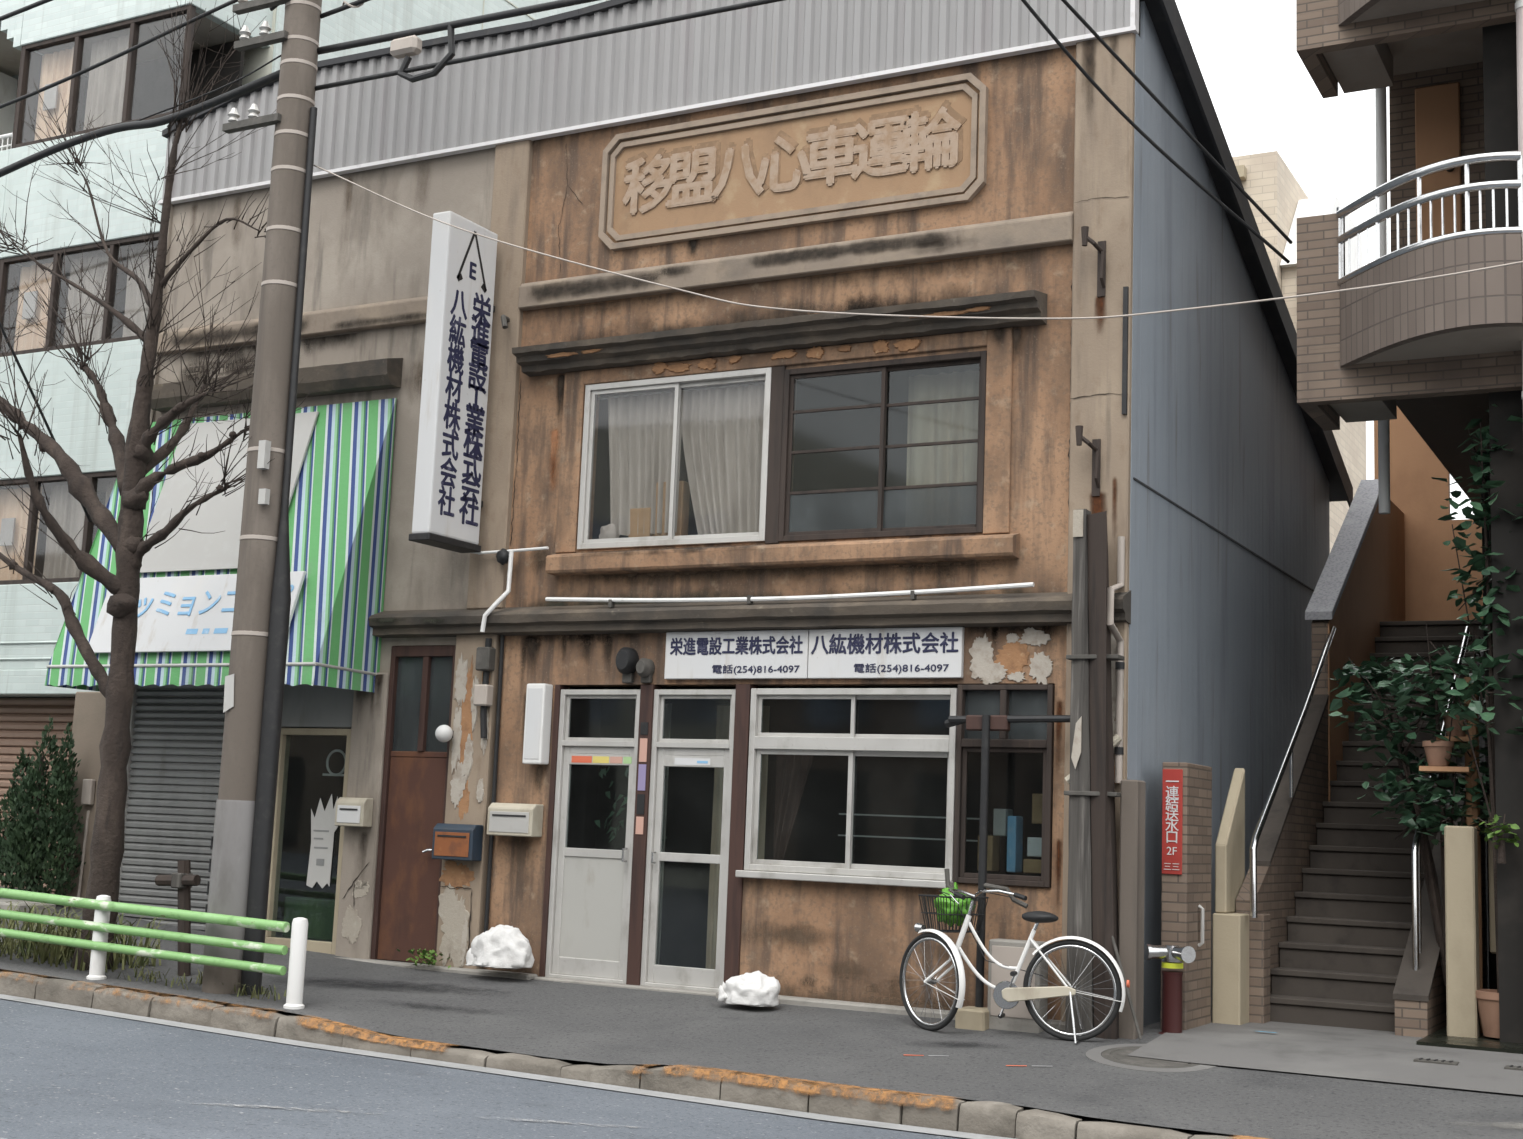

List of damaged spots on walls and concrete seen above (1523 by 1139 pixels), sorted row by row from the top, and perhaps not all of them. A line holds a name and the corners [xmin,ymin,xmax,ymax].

corrosion [1096,296,1105,323]
peeling [969,627,1053,685]
peeling [450,653,490,820]
spalling [439,860,475,890]